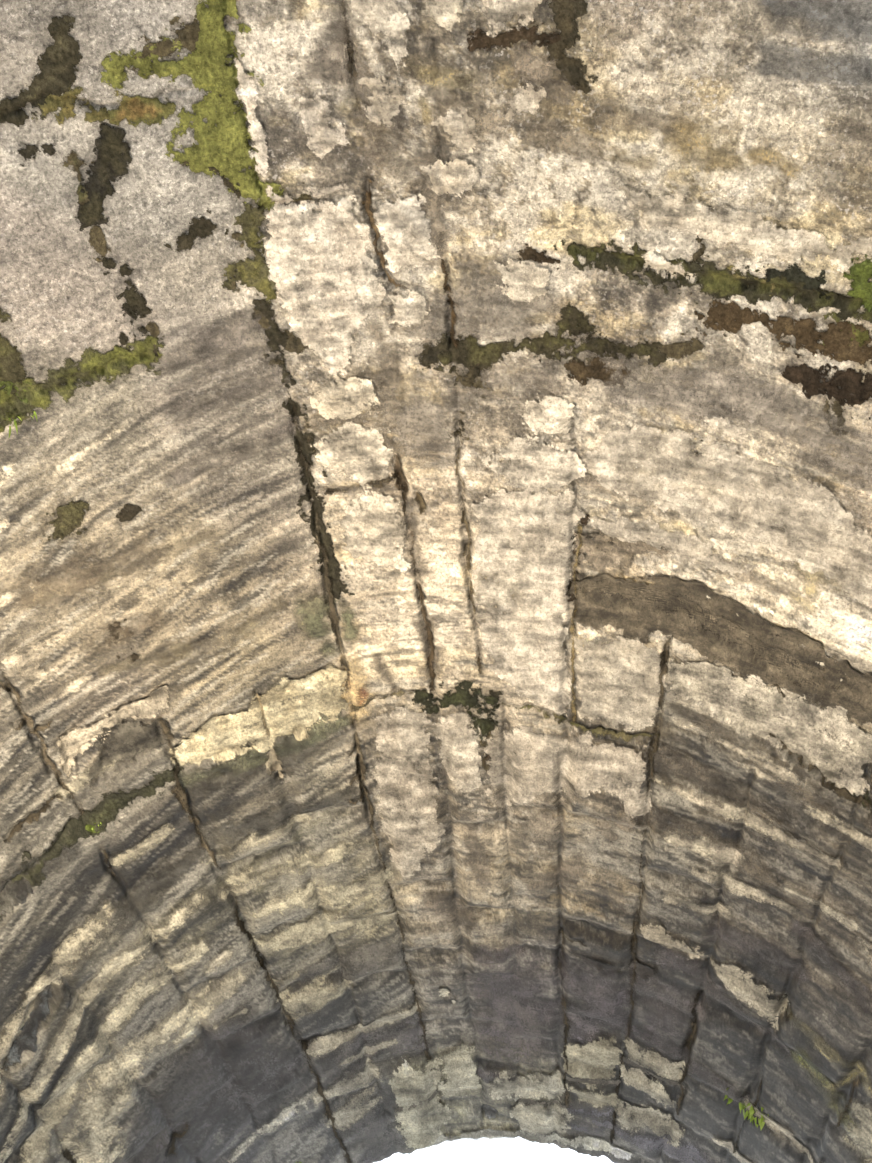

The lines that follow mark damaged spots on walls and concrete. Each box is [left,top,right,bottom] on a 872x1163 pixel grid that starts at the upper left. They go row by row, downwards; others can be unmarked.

water stain [305,0,474,255]
crack [361,179,411,291]
water stain [414,258,554,357]
water stain [46,425,123,486]
water stain [161,312,558,488]
water stain [561,330,872,489]
crack [0,663,84,843]
spalling [56,664,349,782]
crack [455,436,481,674]
crack [502,524,673,1144]
peeling [374,394,872,881]
crack [159,720,351,1163]